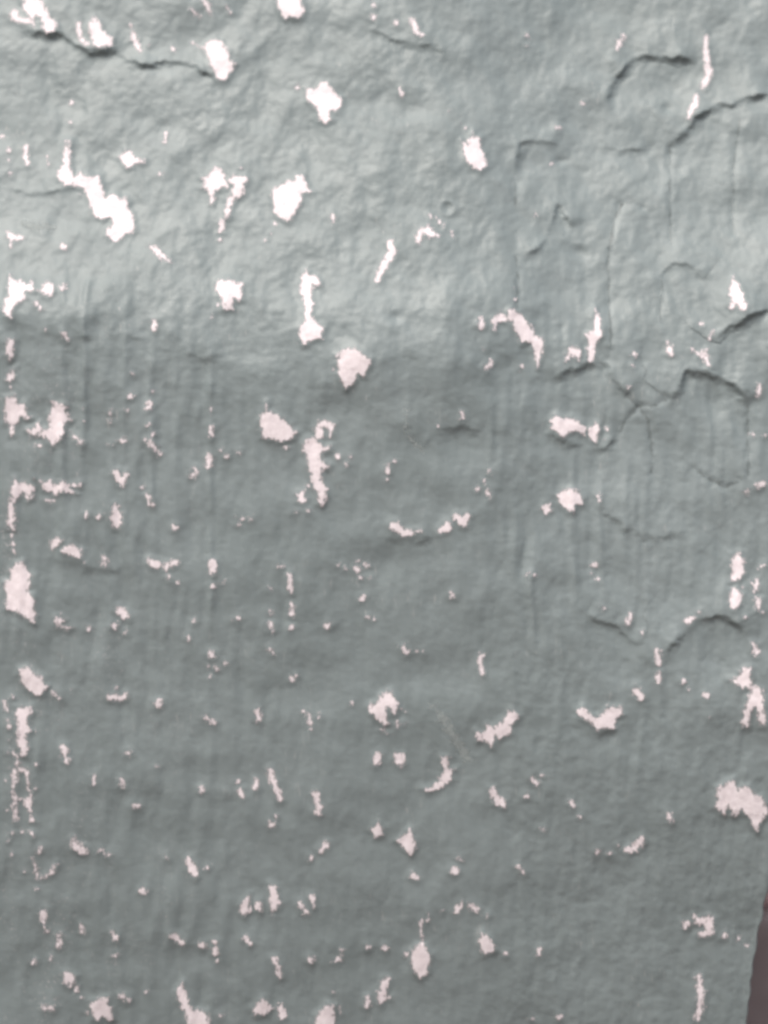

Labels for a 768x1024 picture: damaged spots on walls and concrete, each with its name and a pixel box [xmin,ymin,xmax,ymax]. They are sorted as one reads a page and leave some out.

peeling [192,39,236,81]
peeling [296,81,342,124]
peeling [46,140,135,242]
peeling [264,174,311,241]
peeling [3,338,85,448]
peeling [333,347,371,389]
peeling [479,298,543,368]
peeling [259,404,352,513]
peeling [549,416,608,443]
peeling [4,479,84,624]
peeling [733,642,766,728]
peeling [715,780,768,832]